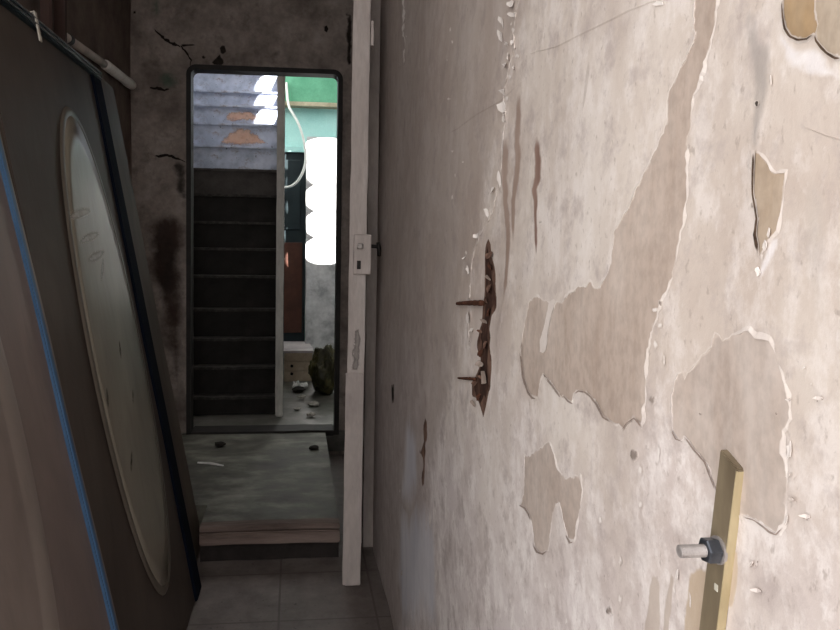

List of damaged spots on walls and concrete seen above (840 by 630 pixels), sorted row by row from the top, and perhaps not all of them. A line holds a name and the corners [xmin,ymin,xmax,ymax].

crack [149,85,170,93]
crack [154,154,186,213]
crack [153,28,197,67]
peeling [462,0,520,300]
rust [531,133,543,260]
peeling [519,0,720,430]
peeling [750,150,788,281]
peeling [777,0,840,83]
water stain [140,205,186,424]
peeling [670,326,792,537]
peeling [518,441,583,556]